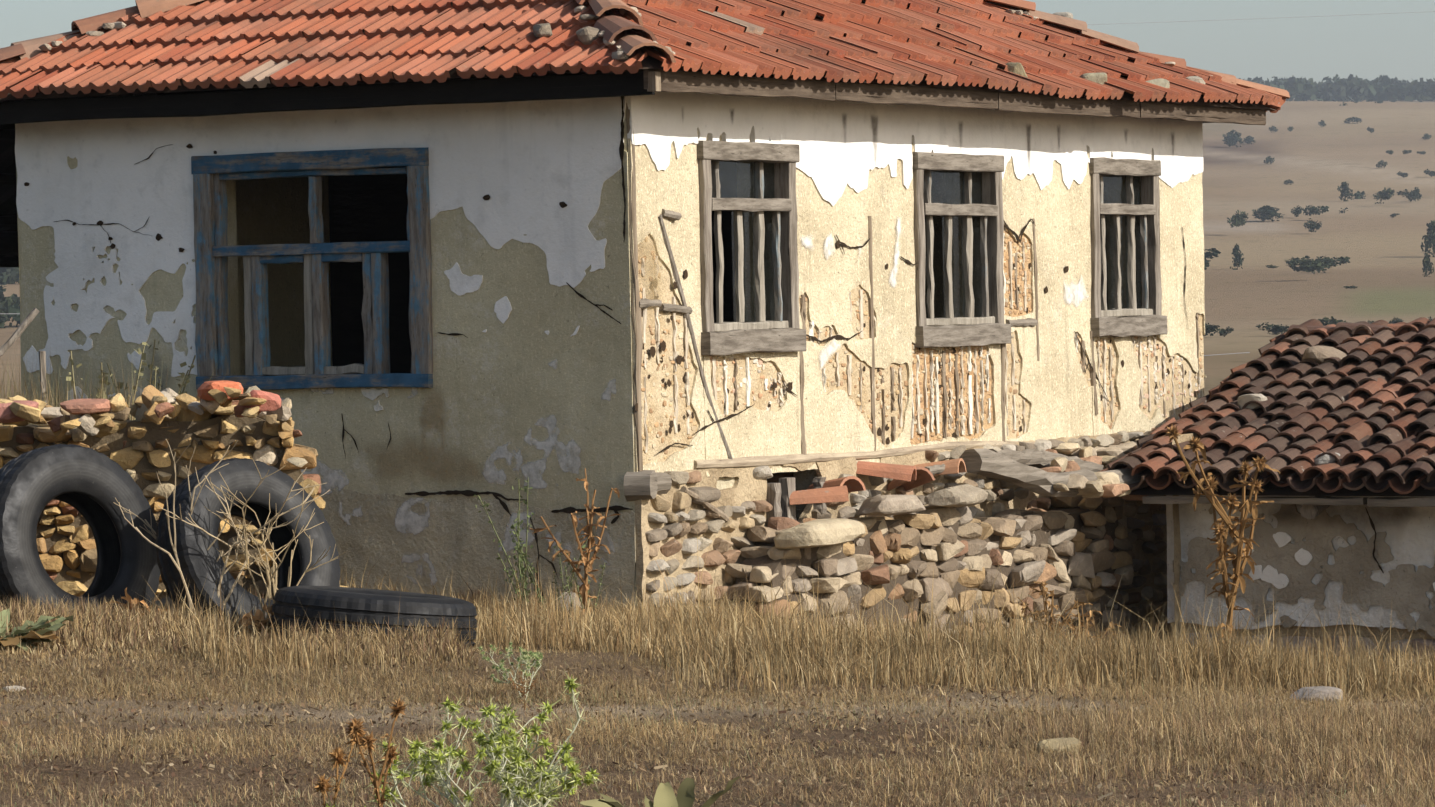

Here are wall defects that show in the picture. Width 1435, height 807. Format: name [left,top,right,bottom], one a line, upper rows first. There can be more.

peeling [18,217,197,407]
peeling [243,131,1206,617]
flaking render [1173,504,1435,638]